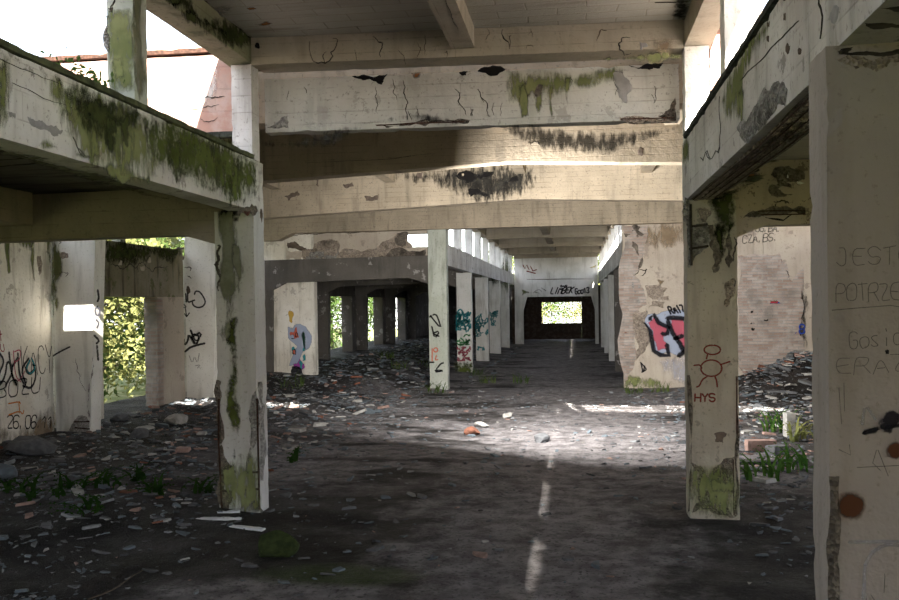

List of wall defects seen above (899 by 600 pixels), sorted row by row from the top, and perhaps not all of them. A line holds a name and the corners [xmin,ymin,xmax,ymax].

water stain [0,78,168,199]
water stain [113,0,146,98]
crack [309,38,357,64]
spalling [352,74,387,85]
crack [373,36,448,120]
crack [455,89,502,117]
spalling [478,65,505,76]
crack [485,29,533,49]
mould [406,165,536,202]
peeling [682,81,809,518]
water stain [226,317,240,430]
spalling [826,476,841,600]